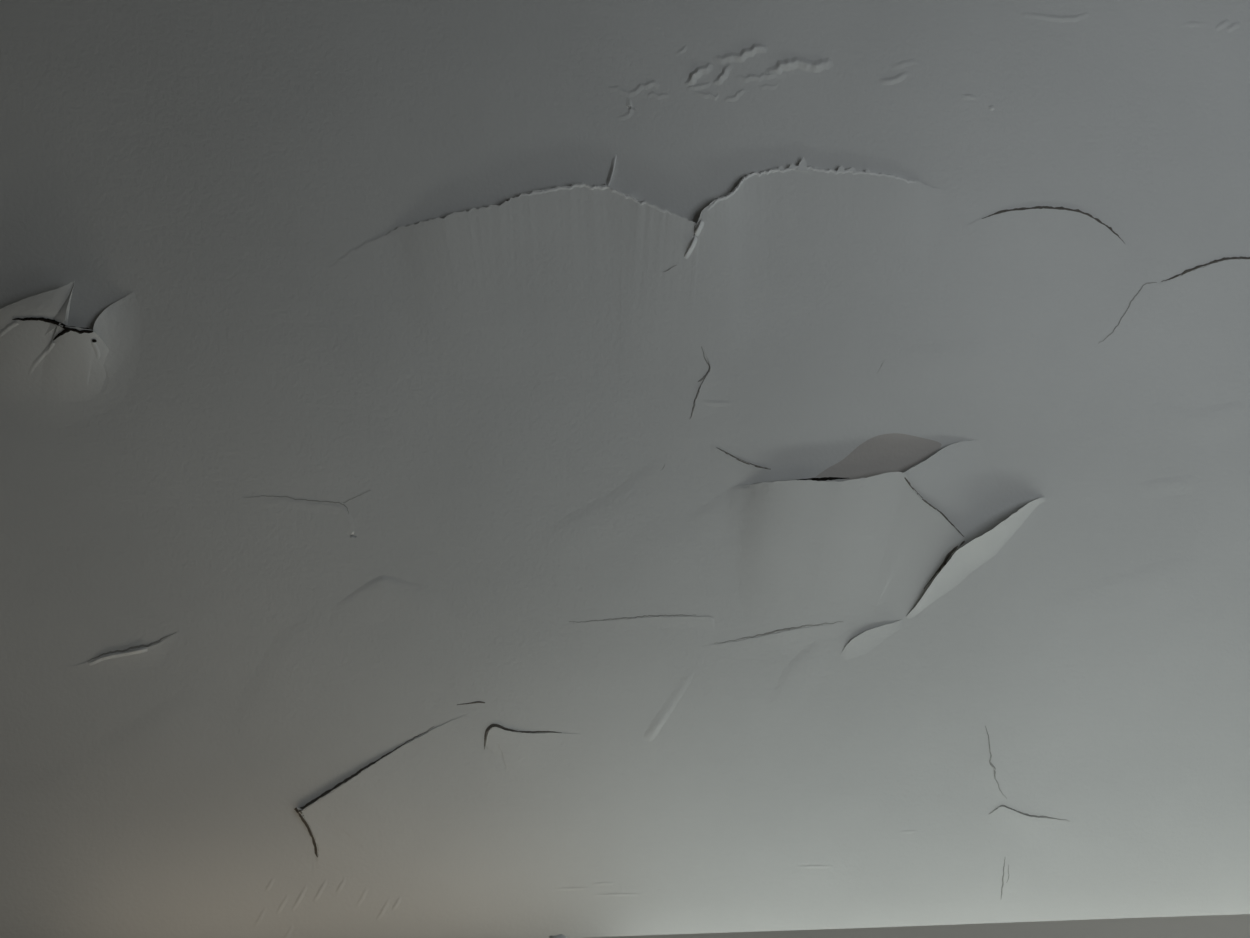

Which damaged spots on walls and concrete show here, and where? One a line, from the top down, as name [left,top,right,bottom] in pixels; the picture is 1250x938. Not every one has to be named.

peeling [321,155,943,389]
peeling [709,433,1046,660]
crack [56,633,178,677]
crack [294,701,585,871]
crack [971,726,1070,898]